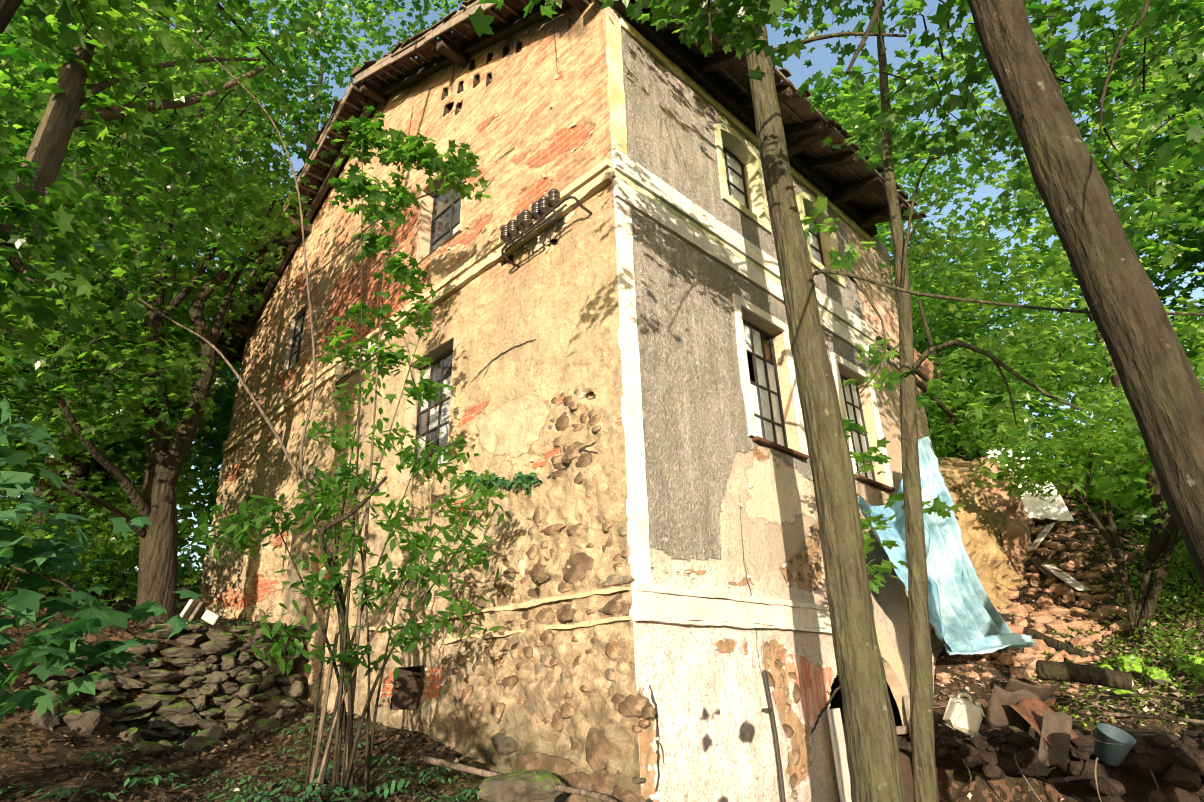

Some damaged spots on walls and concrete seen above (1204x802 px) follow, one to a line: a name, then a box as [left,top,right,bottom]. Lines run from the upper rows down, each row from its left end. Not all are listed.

flaking render [507,122,595,215]
flaking render [428,213,493,259]
crack [471,339,536,382]
flaking render [454,389,601,485]
flaking render [738,449,822,596]
flaking render [651,565,706,579]
flaking render [380,668,399,698]
spalling [419,507,661,802]
crack [649,685,664,792]
flaking render [713,639,748,658]
damp [739,721,755,743]
flaking render [763,640,834,799]